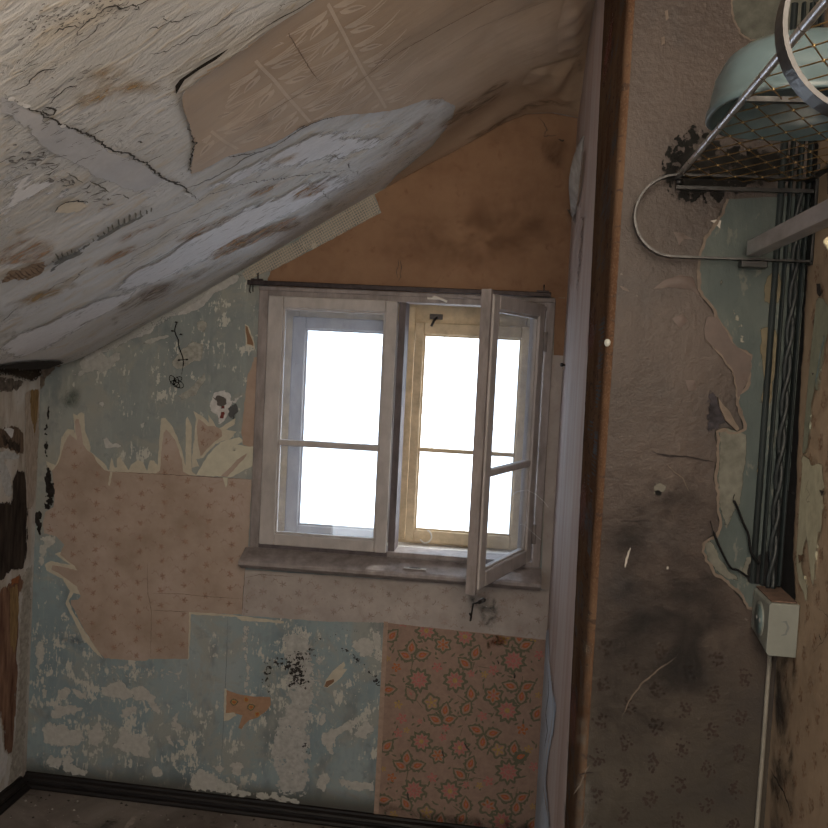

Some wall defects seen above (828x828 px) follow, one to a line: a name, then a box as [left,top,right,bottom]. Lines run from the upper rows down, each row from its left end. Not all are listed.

flaking render [18,0,130,46]
crack [54,0,148,49]
peeling [0,151,129,222]
crack [0,9,415,336]
peeling [212,130,381,189]
flaking render [707,390,739,431]
peeling [0,175,347,786]
peeling [352,630,381,661]
peeling [189,633,374,804]